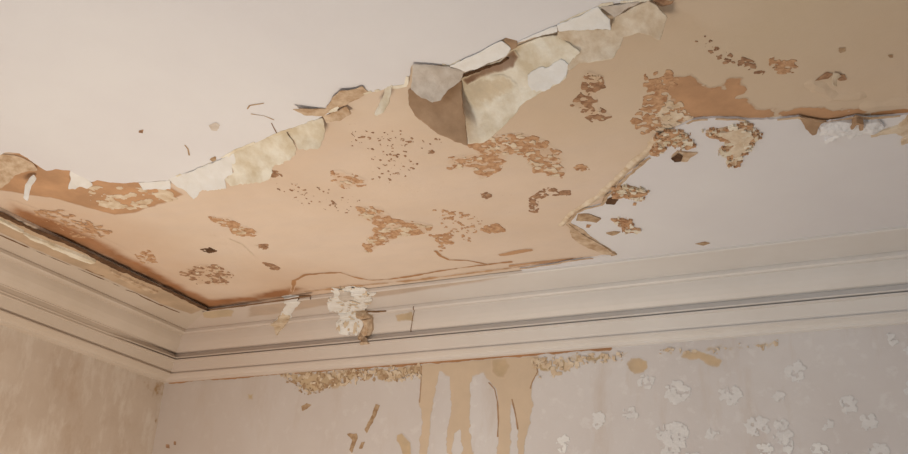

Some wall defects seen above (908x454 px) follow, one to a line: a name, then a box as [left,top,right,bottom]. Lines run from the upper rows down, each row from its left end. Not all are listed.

flaking render [0,0,908,345]
peeling [531,351,630,378]
damp [626,357,648,375]
damp [680,350,724,369]
peeling [280,363,422,411]
damp [396,355,540,454]
peeling [655,421,699,454]
peeling [743,416,794,454]